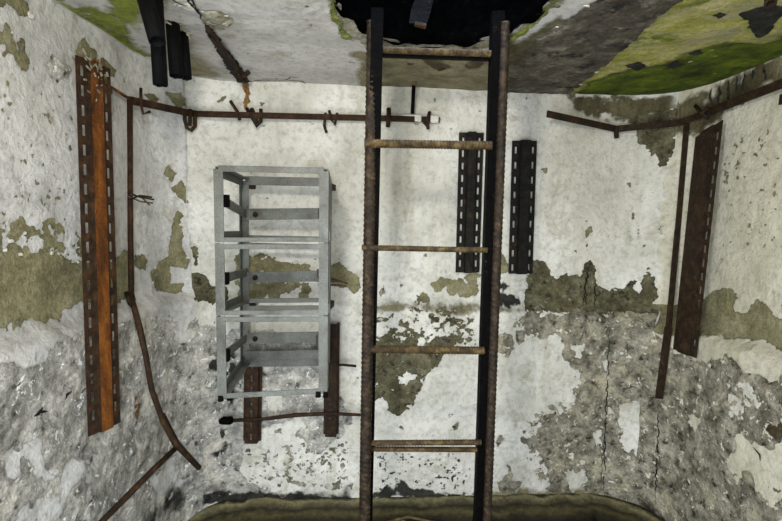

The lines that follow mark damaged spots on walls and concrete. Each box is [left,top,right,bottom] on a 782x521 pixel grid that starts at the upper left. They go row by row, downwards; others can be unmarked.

peeling [164,165,186,203]
peeling [636,108,678,167]
damp [567,57,782,135]
peeling [0,212,91,332]
peeling [110,210,313,305]
crack [582,263,597,306]
peeling [0,313,353,521]
peeling [375,273,481,416]
crack [601,330,610,494]
peeling [498,260,782,521]
crack [653,402,661,504]